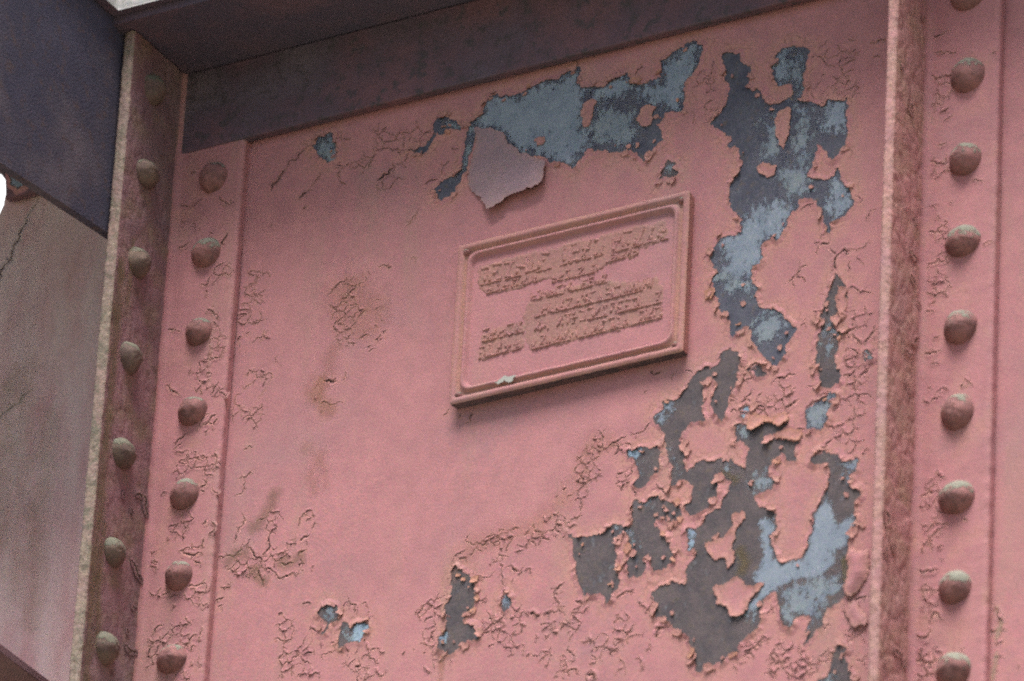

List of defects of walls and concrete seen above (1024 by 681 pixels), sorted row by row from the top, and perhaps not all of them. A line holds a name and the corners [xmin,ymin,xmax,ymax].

crack [0,197,39,281]
crack [122,169,454,681]
peeling [304,127,343,167]
peeling [312,598,376,654]
crack [452,421,670,681]
peeling [404,35,868,681]